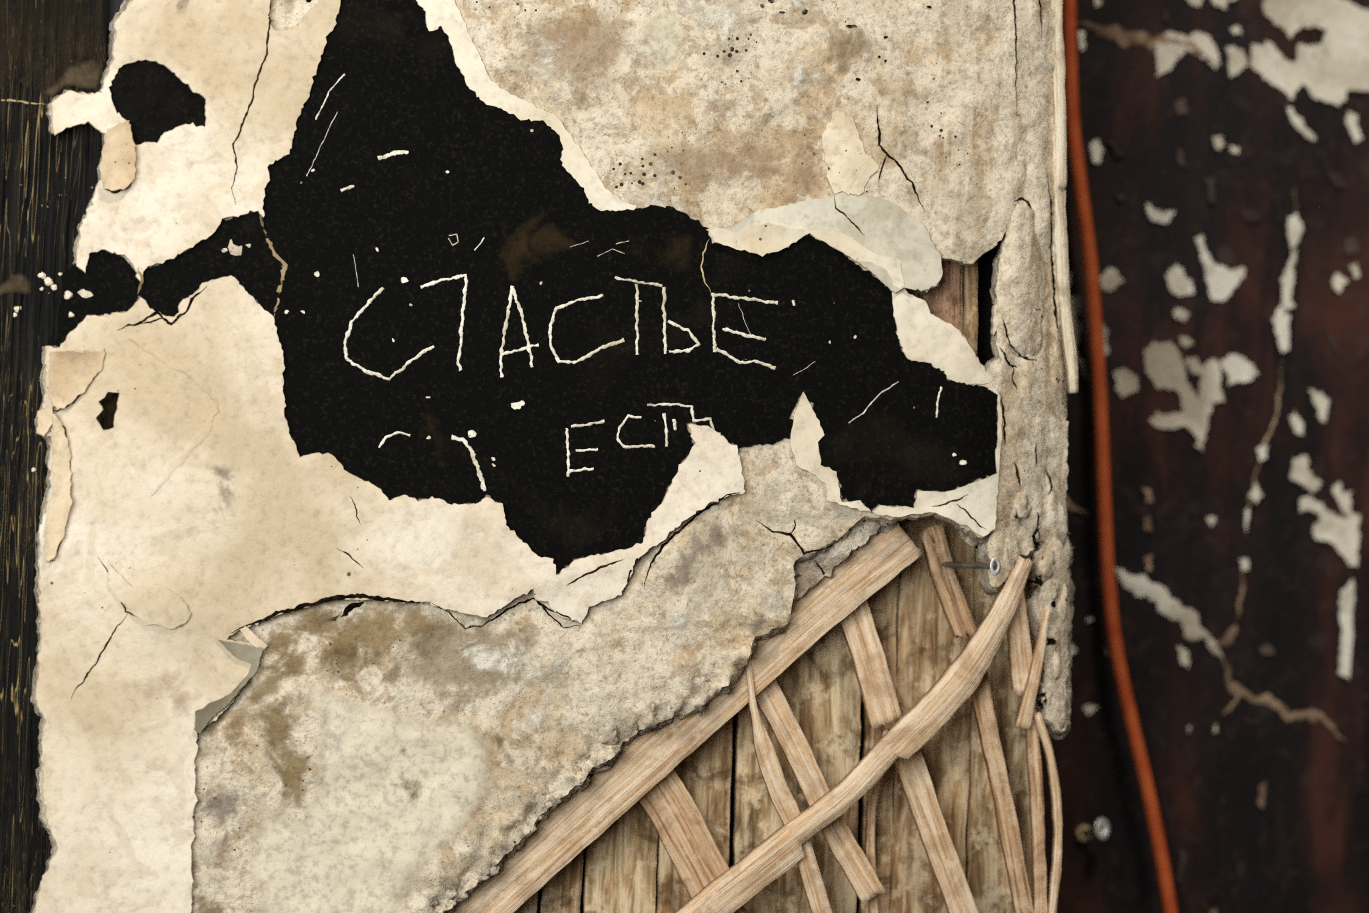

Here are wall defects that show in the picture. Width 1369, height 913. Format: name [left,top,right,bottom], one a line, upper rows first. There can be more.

crack [1012,0,1042,116]
flaking render [1155,0,1369,143]
crack [231,1,288,316]
crack [834,198,864,235]
crack [877,112,925,211]
flaking render [1146,203,1175,224]
crack [52,270,207,561]
peeling [35,0,1068,913]
flaking render [1113,234,1258,452]
flaking render [1289,389,1330,436]
flaking render [1290,456,1361,679]
crack [71,602,137,698]